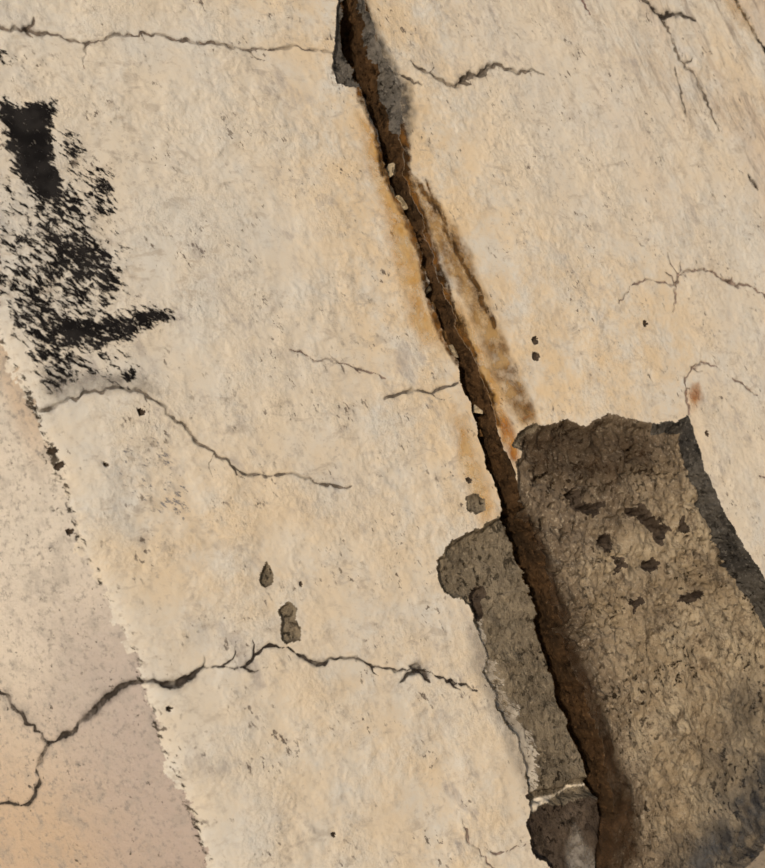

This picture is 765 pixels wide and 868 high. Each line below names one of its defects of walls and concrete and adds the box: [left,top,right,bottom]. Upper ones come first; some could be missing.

crack [0,17,314,69]
crack [642,0,719,130]
corrosion [364,123,431,331]
crack [619,263,765,304]
crack [41,386,286,479]
crack [290,0,615,819]
corrosion [456,314,517,461]
crack [0,640,478,807]
spalling [259,562,274,588]
spalling [278,601,301,645]
spalling [436,477,605,868]
spalling [511,413,765,868]